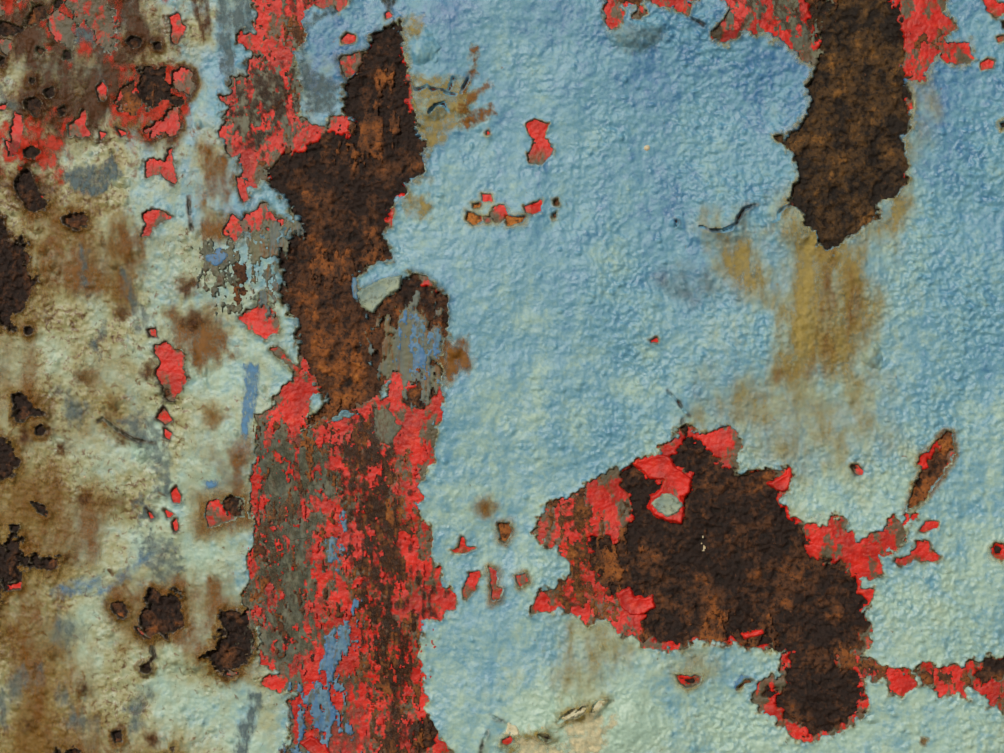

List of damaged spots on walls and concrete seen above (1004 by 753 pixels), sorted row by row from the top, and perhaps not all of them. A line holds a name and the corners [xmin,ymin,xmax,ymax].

peeling [603,0,694,29]
corrosion [0,0,200,753]
corrosion [164,308,234,371]
corrosion [205,409,222,427]
corrosion [198,50,298,241]
peeling [190,0,502,753]
peeling [467,194,542,226]
peeling [526,119,553,164]
corrosion [717,227,765,299]
corrosion [774,193,912,427]
peeling [711,0,994,250]
peeling [530,424,1004,742]